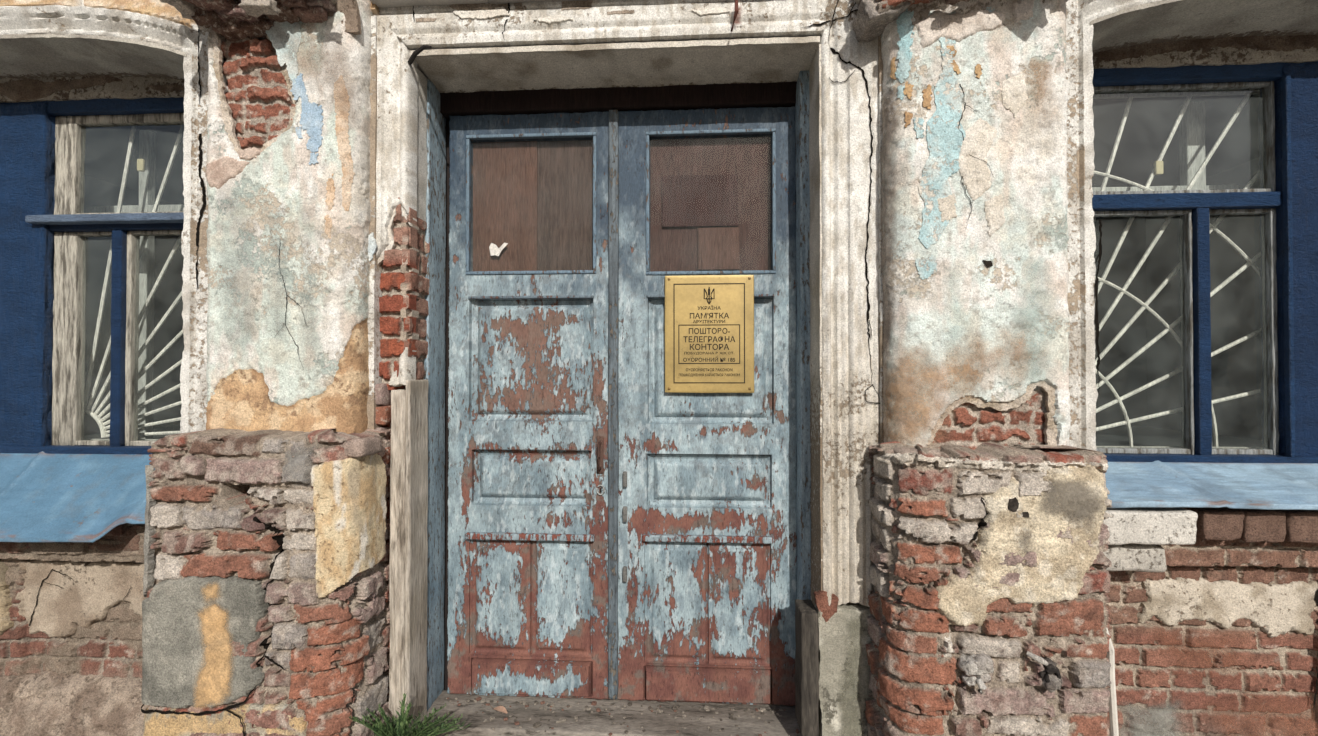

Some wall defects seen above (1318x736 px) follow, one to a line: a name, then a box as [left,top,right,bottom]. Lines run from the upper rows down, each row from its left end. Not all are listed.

crack [195,29,206,288]
flaking render [205,21,355,239]
crack [807,0,880,404]
flaking render [206,197,419,599]
flaking render [928,380,1057,451]
flaking render [0,465,307,736]
crack [141,484,287,736]
flaking render [1137,576,1318,638]
crack [1310,653,1318,712]